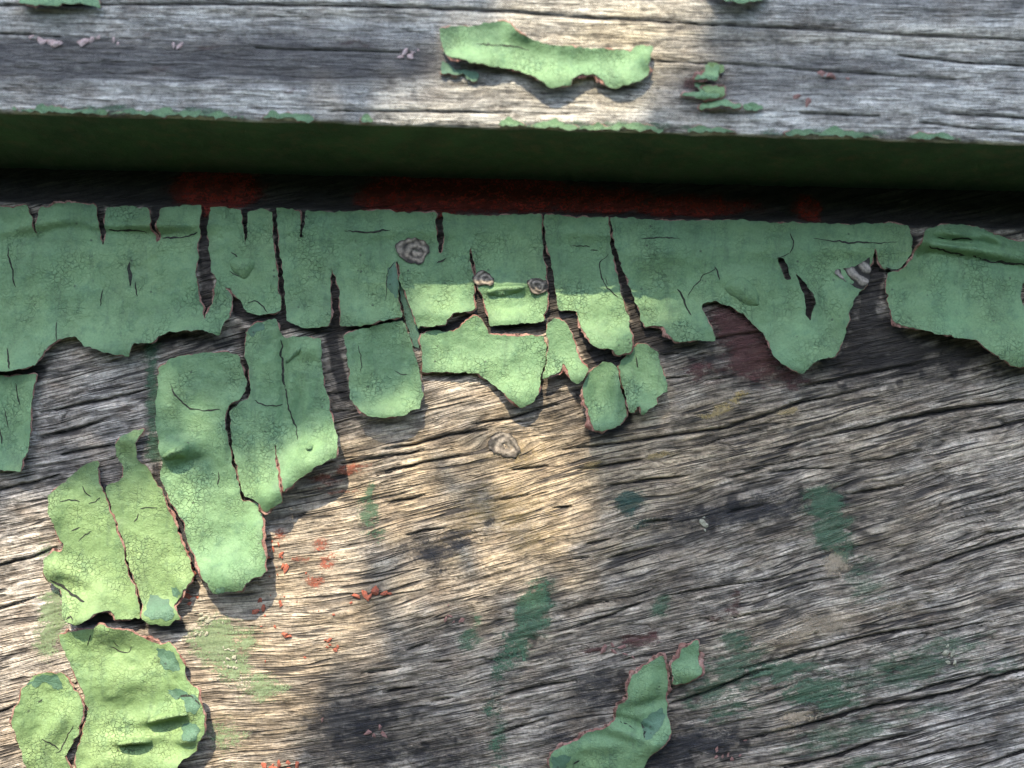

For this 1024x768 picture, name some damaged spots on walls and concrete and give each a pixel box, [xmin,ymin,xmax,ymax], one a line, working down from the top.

peeling [439,20,653,89]
peeling [680,62,763,134]
crack [255,341,298,440]
peeling [0,200,1024,768]